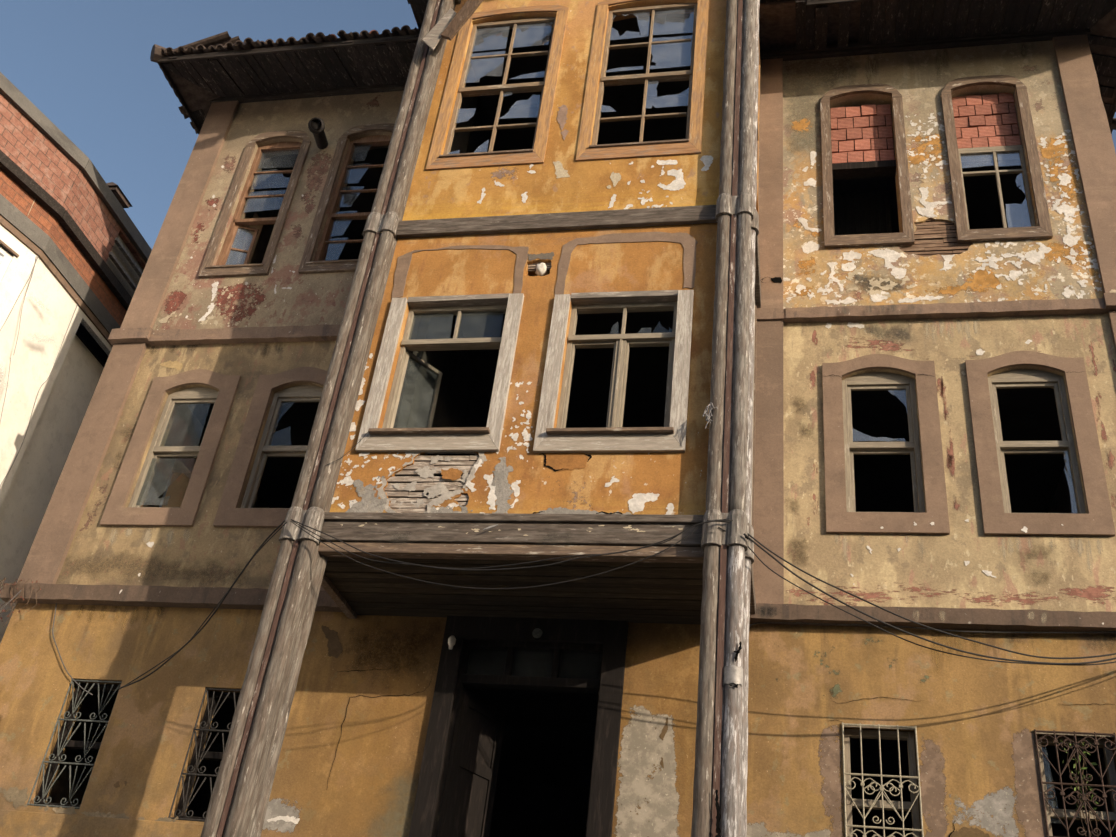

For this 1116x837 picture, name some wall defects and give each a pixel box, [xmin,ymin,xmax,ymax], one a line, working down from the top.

peeling [477,164,536,204]
peeling [607,159,686,209]
peeling [905,112,952,218]
peeling [771,130,1116,305]
peeling [159,255,292,328]
peeling [350,353,373,440]
flaking render [331,452,421,527]
crack [539,453,592,472]
flaking render [262,798,302,833]
crack [327,669,431,787]
flaking render [614,705,680,837]
flaking render [919,728,1047,837]